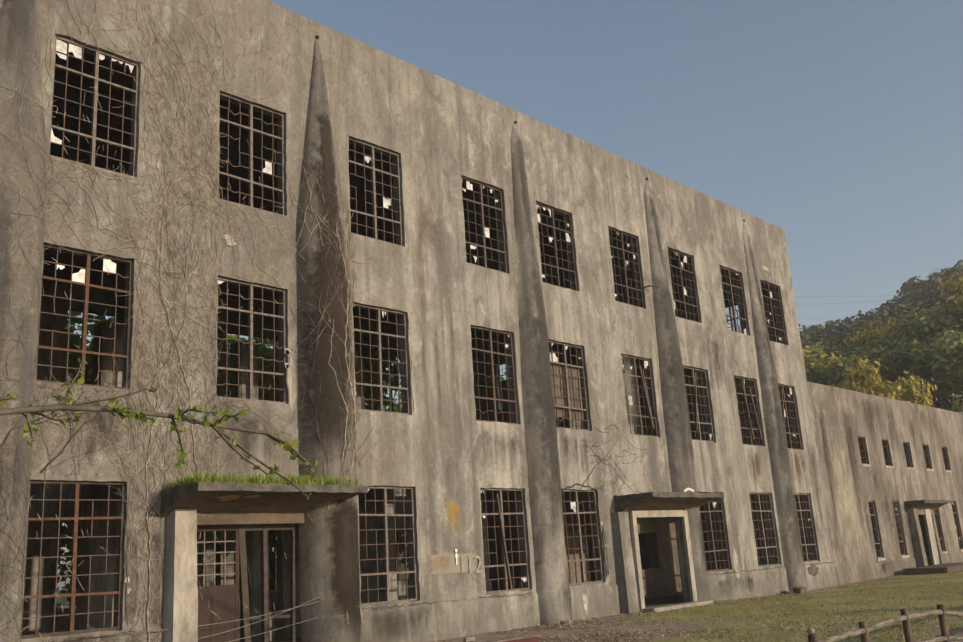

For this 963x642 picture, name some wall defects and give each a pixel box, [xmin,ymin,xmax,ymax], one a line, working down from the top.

water stain [301,73,351,430]
water stain [521,157,534,238]
water stain [526,263,562,500]